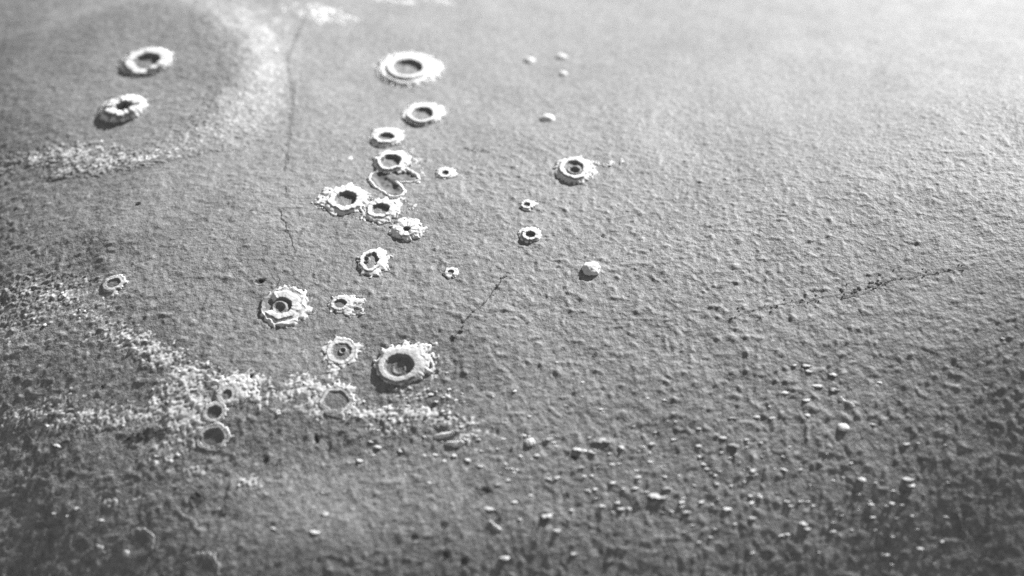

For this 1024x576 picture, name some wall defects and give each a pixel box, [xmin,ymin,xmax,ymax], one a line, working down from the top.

crack [278,11,308,251]
crack [447,273,508,343]
leakage [0,270,496,480]
leakage [95,497,145,508]
leakage [235,473,268,489]